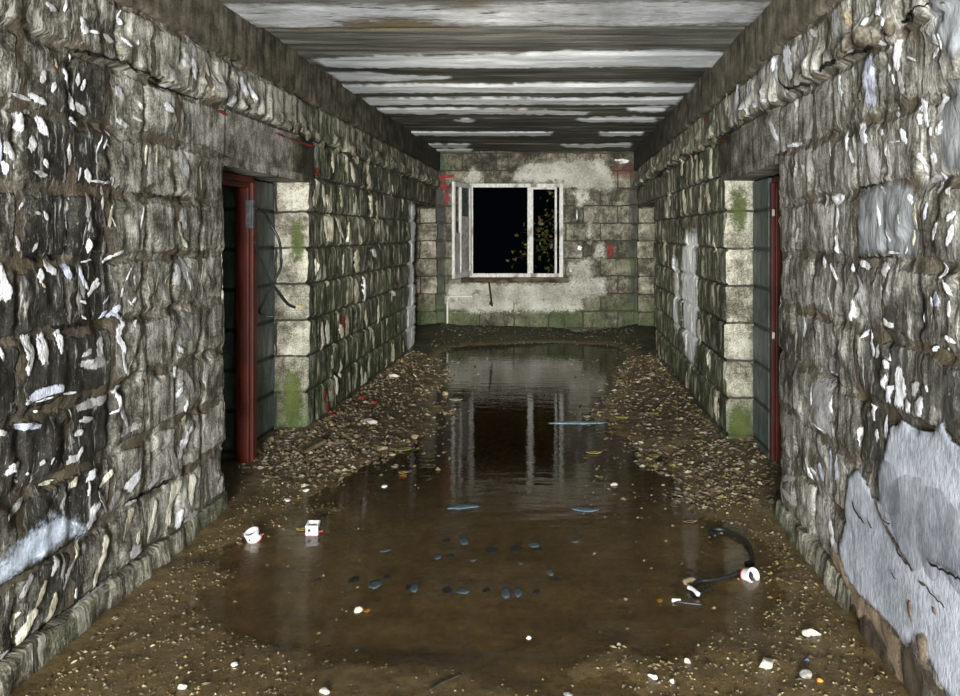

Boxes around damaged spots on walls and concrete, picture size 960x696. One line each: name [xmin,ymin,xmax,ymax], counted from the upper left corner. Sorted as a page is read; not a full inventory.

flaking render [439,174,455,204]
crack [852,465,960,608]